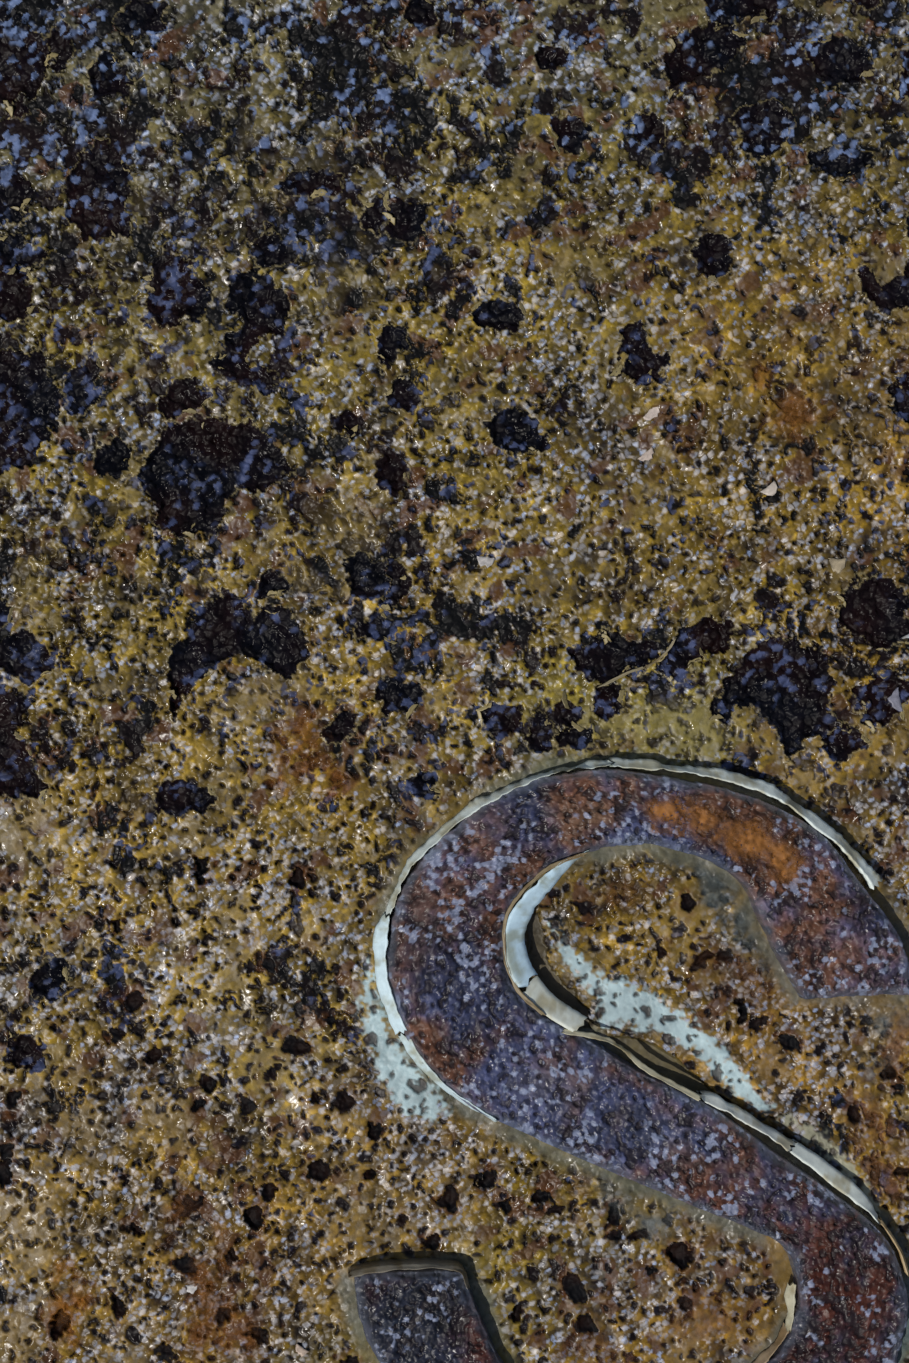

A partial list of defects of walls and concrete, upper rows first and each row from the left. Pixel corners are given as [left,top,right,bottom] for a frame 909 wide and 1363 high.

corrosion [404,769,441,800]
corrosion [648,799,798,879]